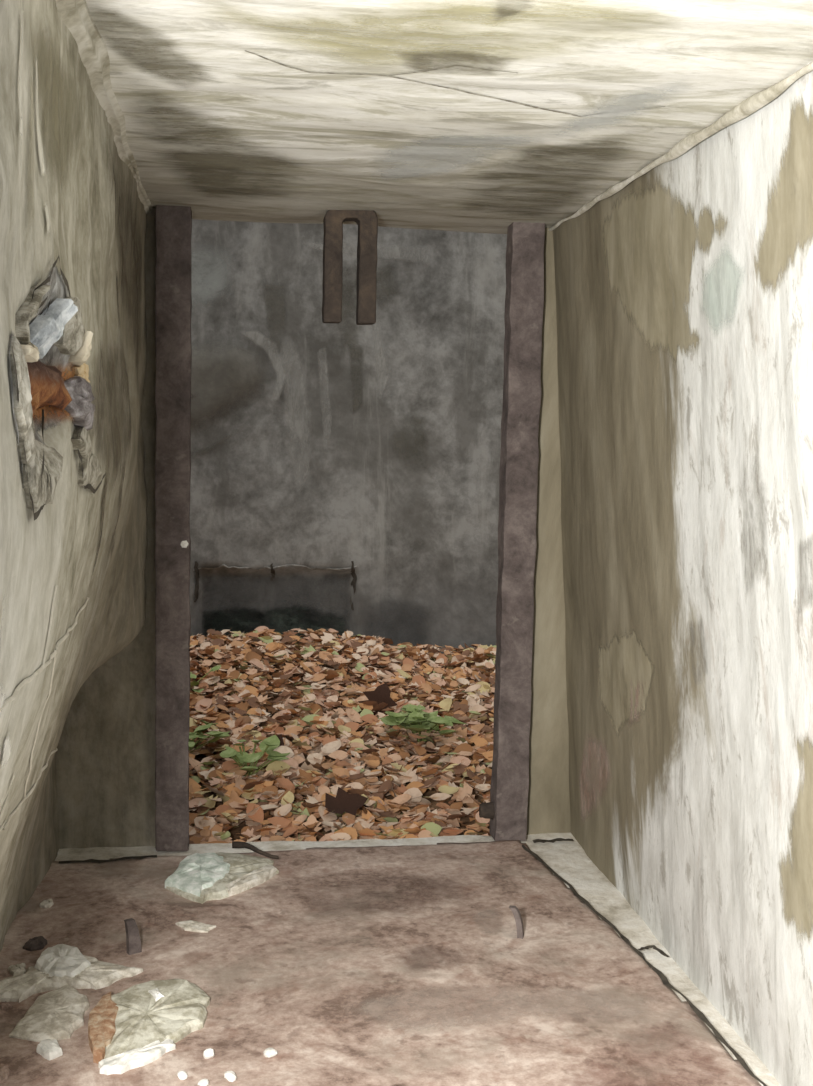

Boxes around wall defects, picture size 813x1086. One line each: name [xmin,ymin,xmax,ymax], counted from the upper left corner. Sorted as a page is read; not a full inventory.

water stain [94,12,203,81]
water stain [263,4,636,72]
water stain [145,99,290,195]
water stain [475,140,621,214]
peeling [754,98,813,289]
rust [27,360,72,413]
spalling [8,256,106,520]
peeling [779,739,813,941]